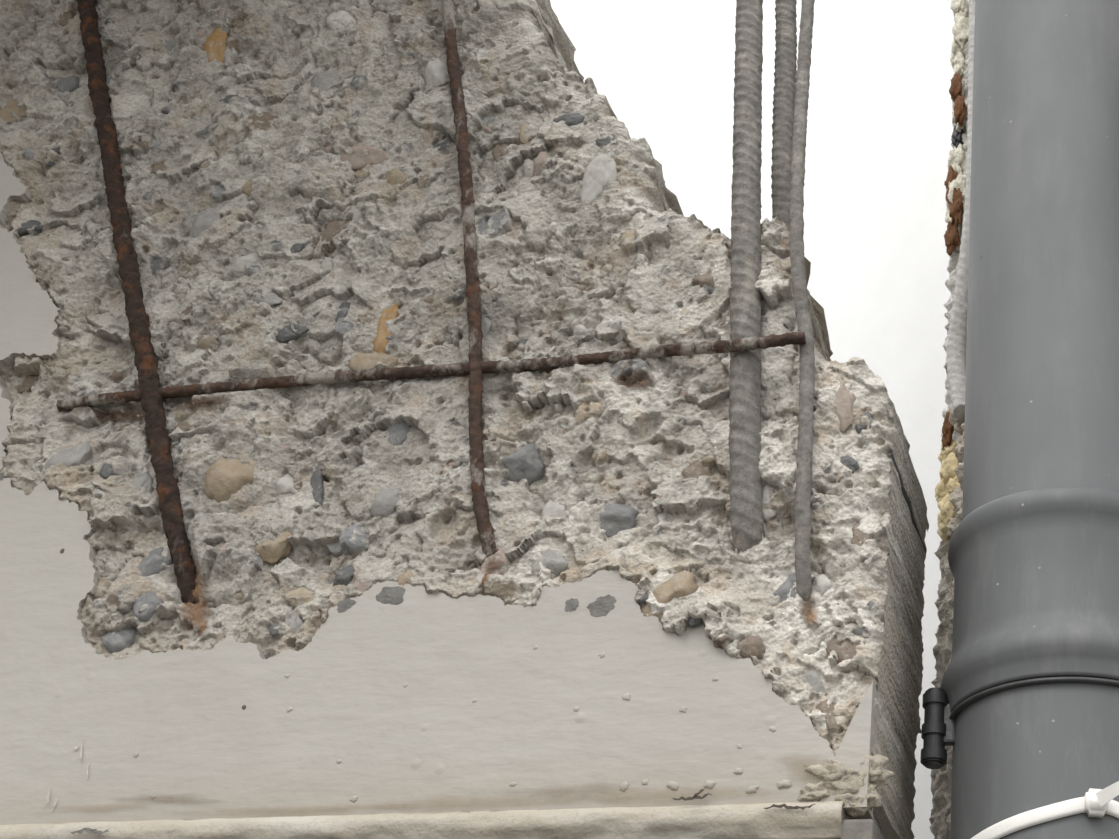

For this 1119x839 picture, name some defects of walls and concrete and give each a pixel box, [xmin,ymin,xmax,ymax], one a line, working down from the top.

rust [949,73,967,127]
spalling [95,0,470,388]
spalling [453,0,732,362]
rust [944,165,963,256]
spalling [755,214,798,336]
rust [77,407,146,422]
spalling [204,454,259,503]
spalling [276,473,298,495]
spalling [254,531,293,564]
spalling [132,591,164,622]
spalling [101,627,137,654]
spalling [797,754,895,817]